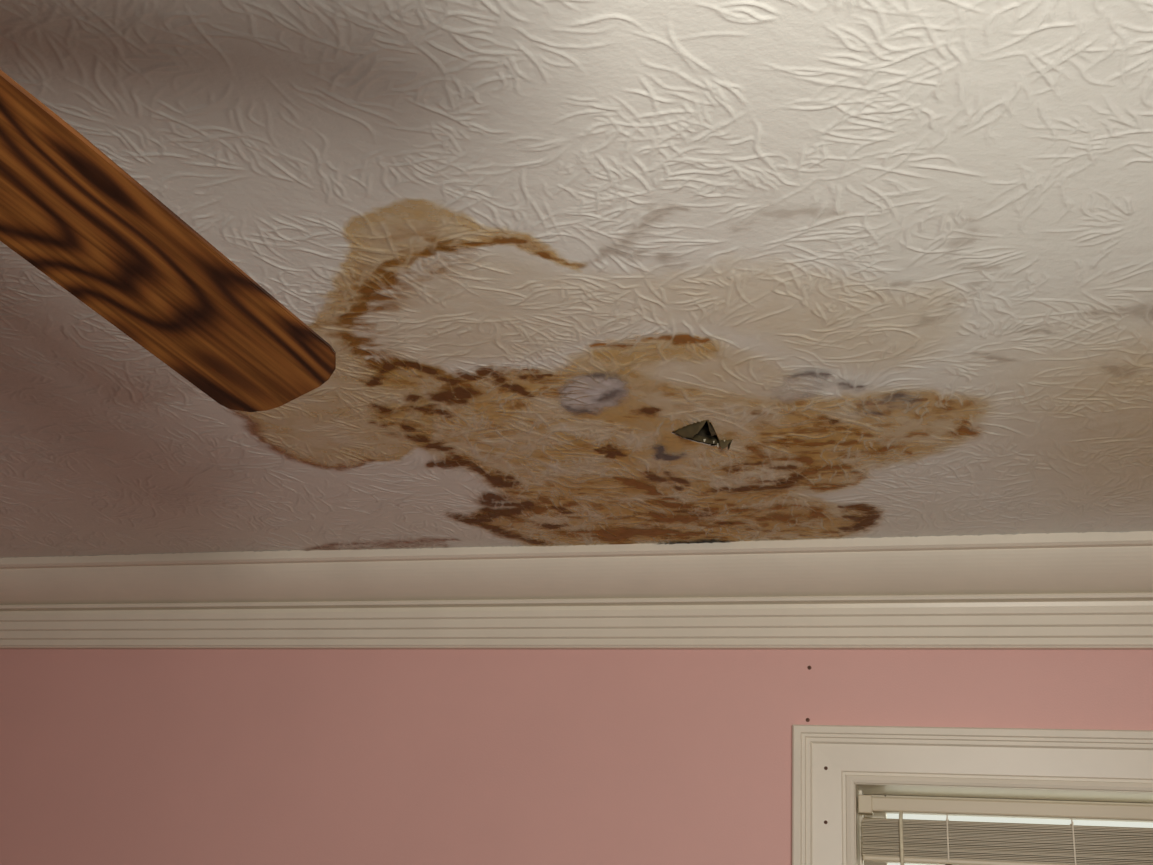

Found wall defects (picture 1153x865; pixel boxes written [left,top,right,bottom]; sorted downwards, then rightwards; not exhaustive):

water stain [237,201,979,546]
peeling [673,420,733,450]